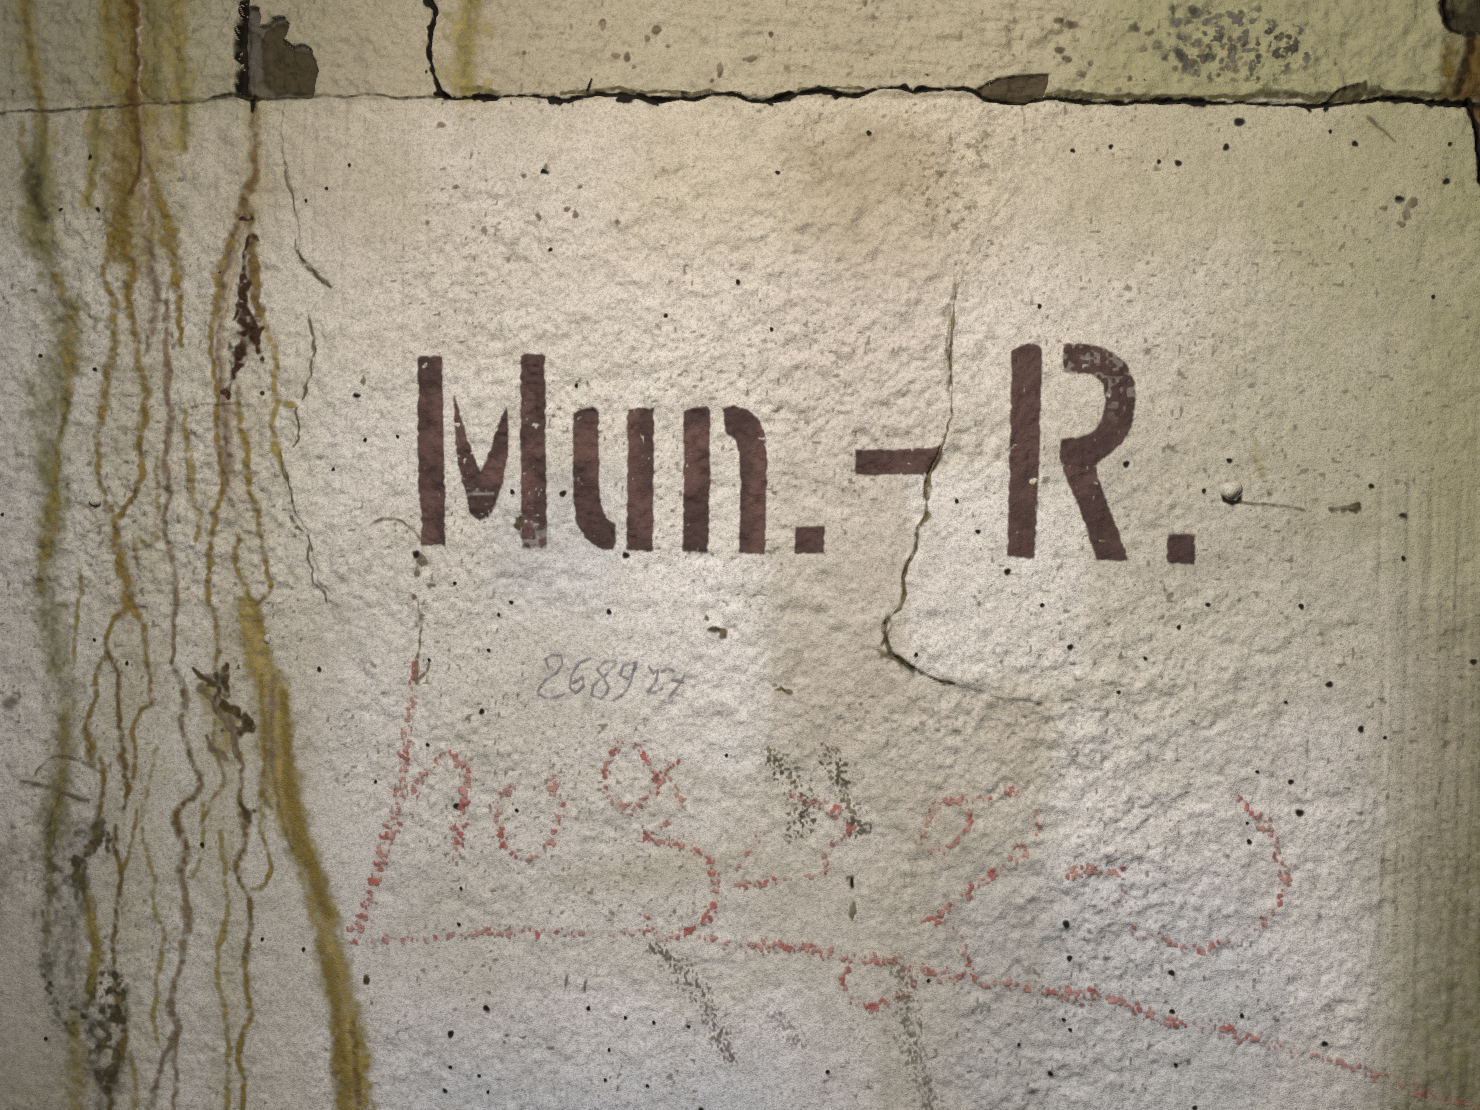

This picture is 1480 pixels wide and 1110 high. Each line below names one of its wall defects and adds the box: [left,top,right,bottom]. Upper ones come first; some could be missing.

damp [18,0,57,250]
damp [80,104,104,207]
damp [165,0,195,151]
spalling [234,0,319,103]
crack [0,0,1480,184]
spalling [1437,0,1480,35]
rust [1441,31,1480,118]
damp [40,272,77,560]
crack [880,293,956,684]
damp [72,574,84,657]
damp [239,597,371,1110]
damp [87,895,101,990]